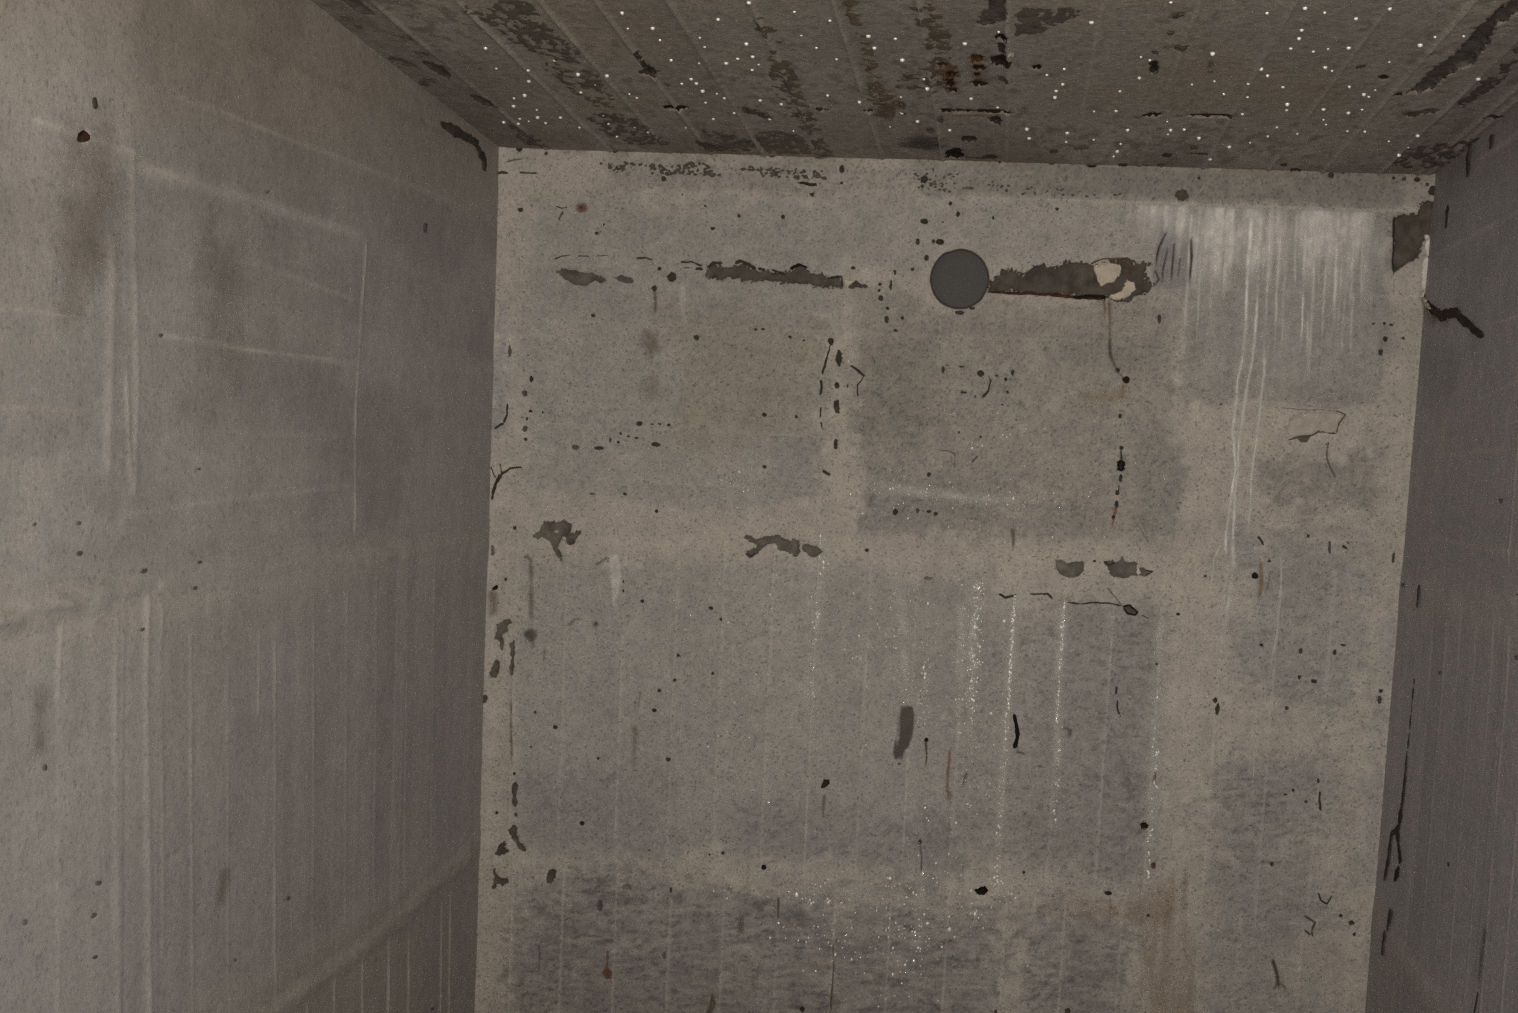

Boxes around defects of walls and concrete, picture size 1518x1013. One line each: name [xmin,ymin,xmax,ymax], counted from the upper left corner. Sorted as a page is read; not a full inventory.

peeling [461,0,671,155]
spalling [976,0,1084,84]
spalling [1392,0,1518,118]
spalling [658,201,960,332]
spalling [988,257,1155,303]
spalling [1392,137,1480,289]
water stain [1145,205,1368,567]
water stain [848,416,1063,522]
spalling [513,519,581,562]
spalling [744,535,823,558]